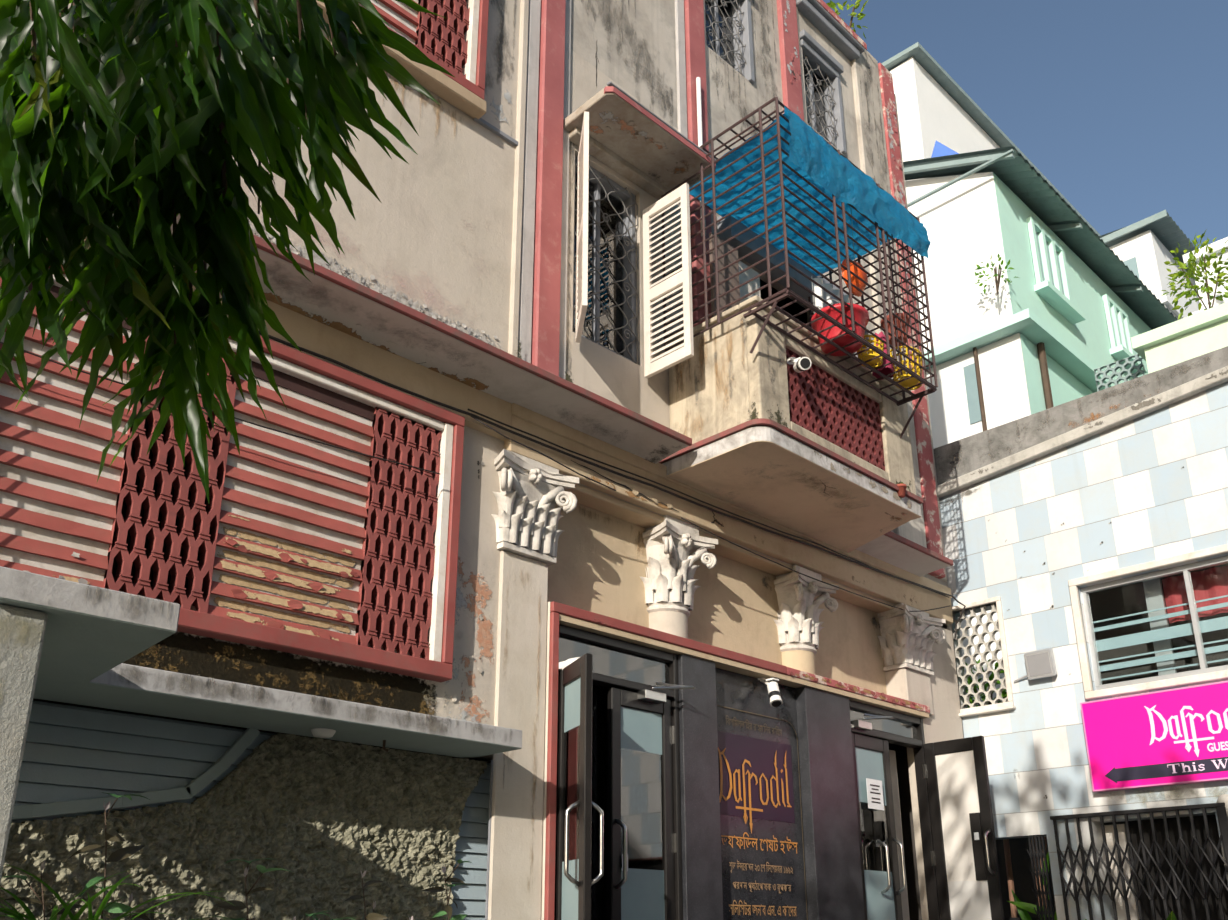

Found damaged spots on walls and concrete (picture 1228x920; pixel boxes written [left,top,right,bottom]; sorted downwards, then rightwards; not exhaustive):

damp [587,0,673,115]
peeling [886,102,906,207]
peeling [213,515,359,641]
peeling [446,558,494,723]